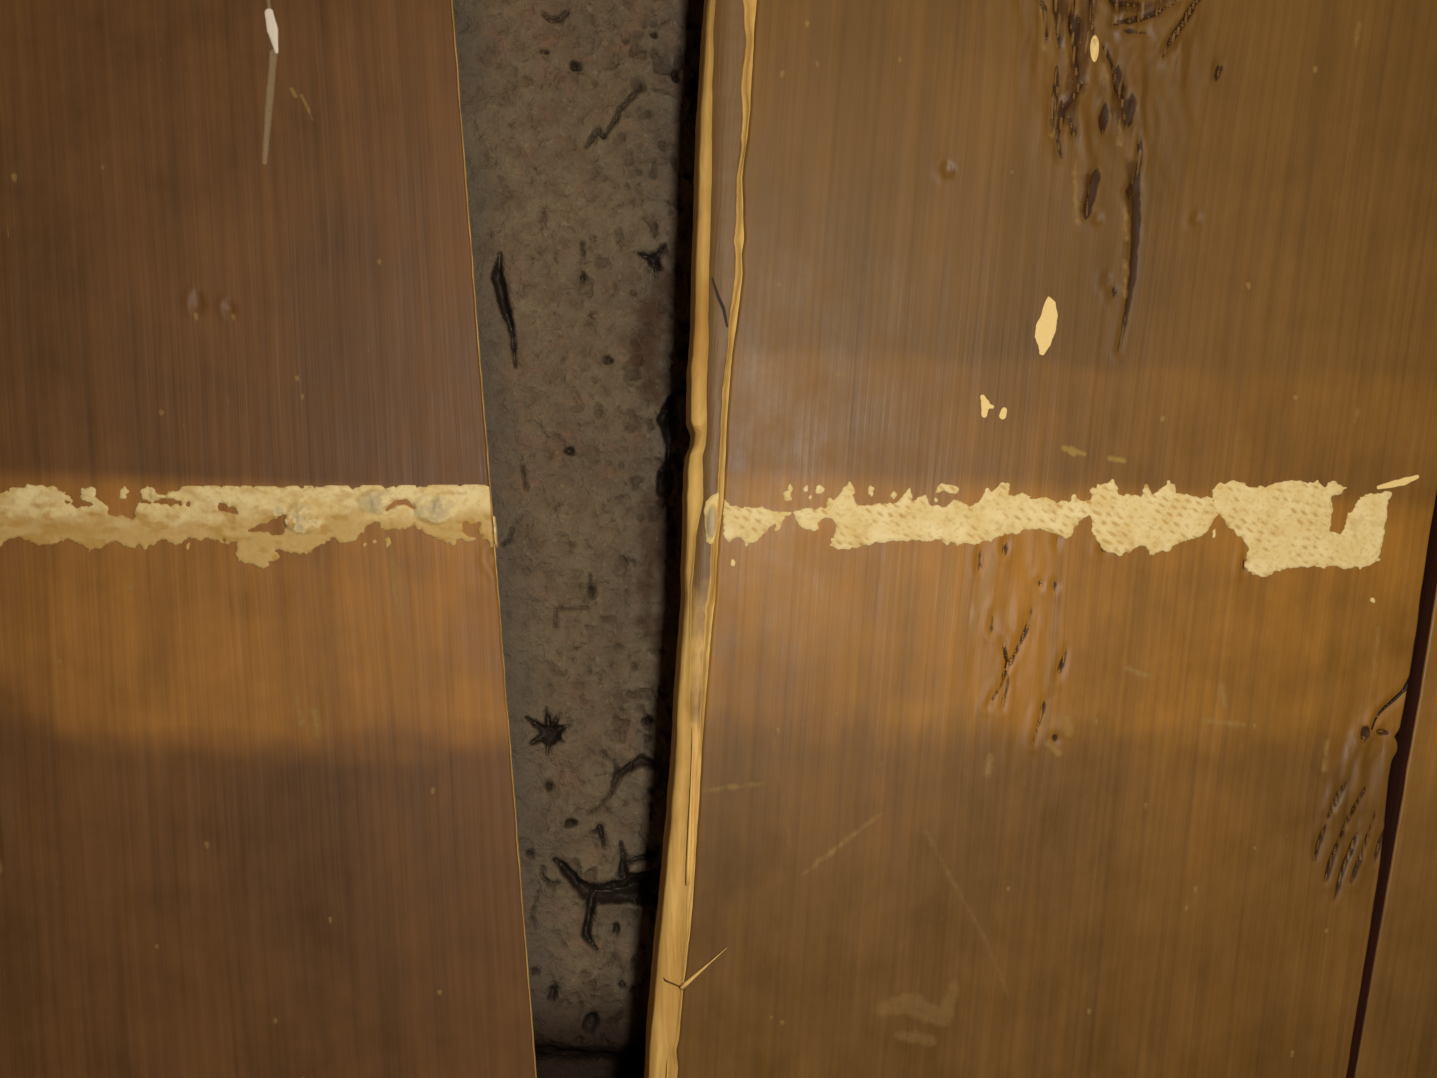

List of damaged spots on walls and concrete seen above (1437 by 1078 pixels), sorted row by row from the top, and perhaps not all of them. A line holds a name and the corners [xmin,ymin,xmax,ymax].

peeling [1035,297,1058,355]
spalling [657,396,678,498]
peeling [0,484,498,569]
peeling [704,475,1419,577]
crack [612,756,658,791]